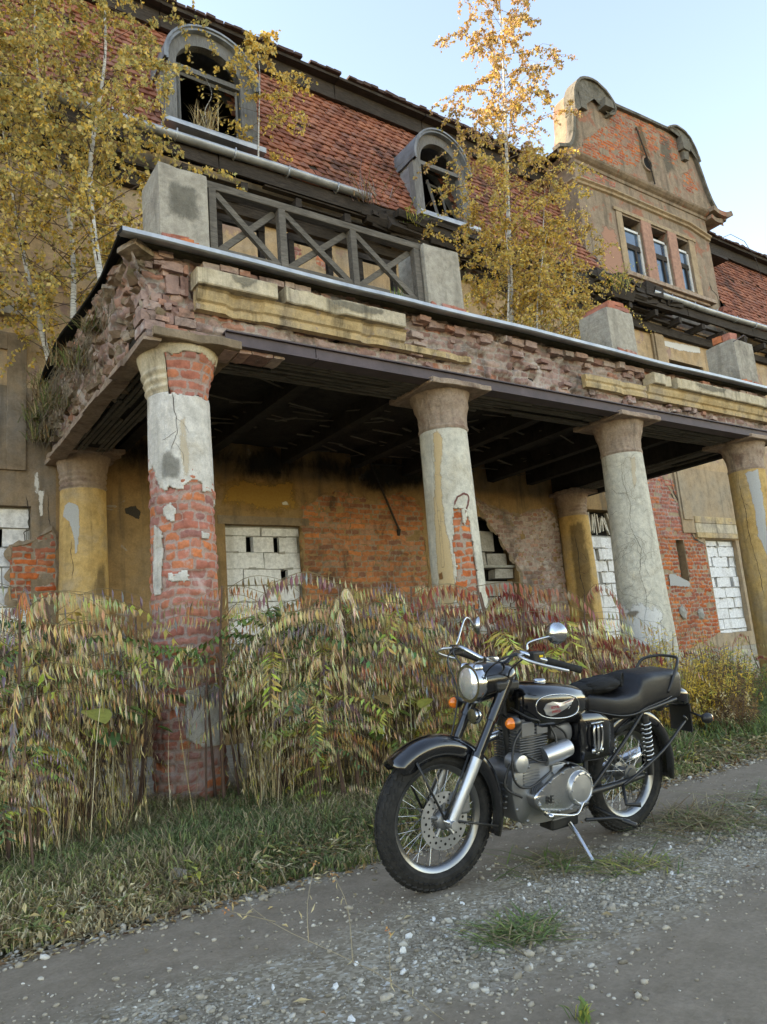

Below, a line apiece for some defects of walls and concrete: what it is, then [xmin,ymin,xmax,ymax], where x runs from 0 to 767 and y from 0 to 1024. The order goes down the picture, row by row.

spalling [578,111,700,196]
spalling [22,238,215,466]
crack [163,393,189,461]
spalling [3,525,59,606]
peeling [63,502,80,554]
spalling [125,460,229,800]
spalling [298,432,574,652]
spalling [647,474,720,652]